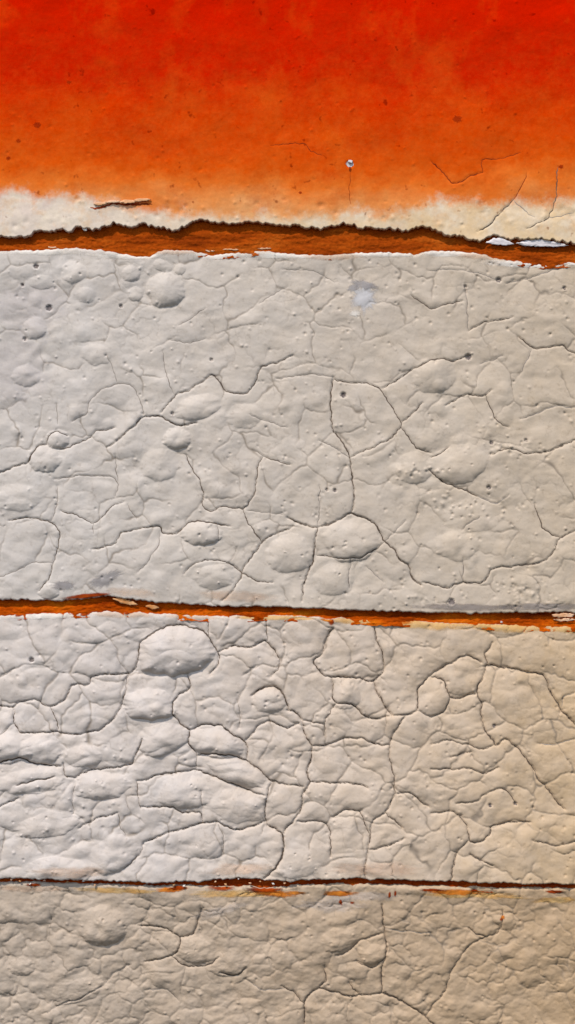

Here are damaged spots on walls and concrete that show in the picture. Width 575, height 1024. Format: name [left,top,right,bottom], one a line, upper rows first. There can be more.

peeling [90,198,151,210]
crack [431,153,570,230]
peeling [0,221,575,270]
crack [0,265,575,601]
corrosion [0,593,575,632]
crack [0,623,575,878]
corrosion [0,877,575,905]
crack [43,907,503,1024]